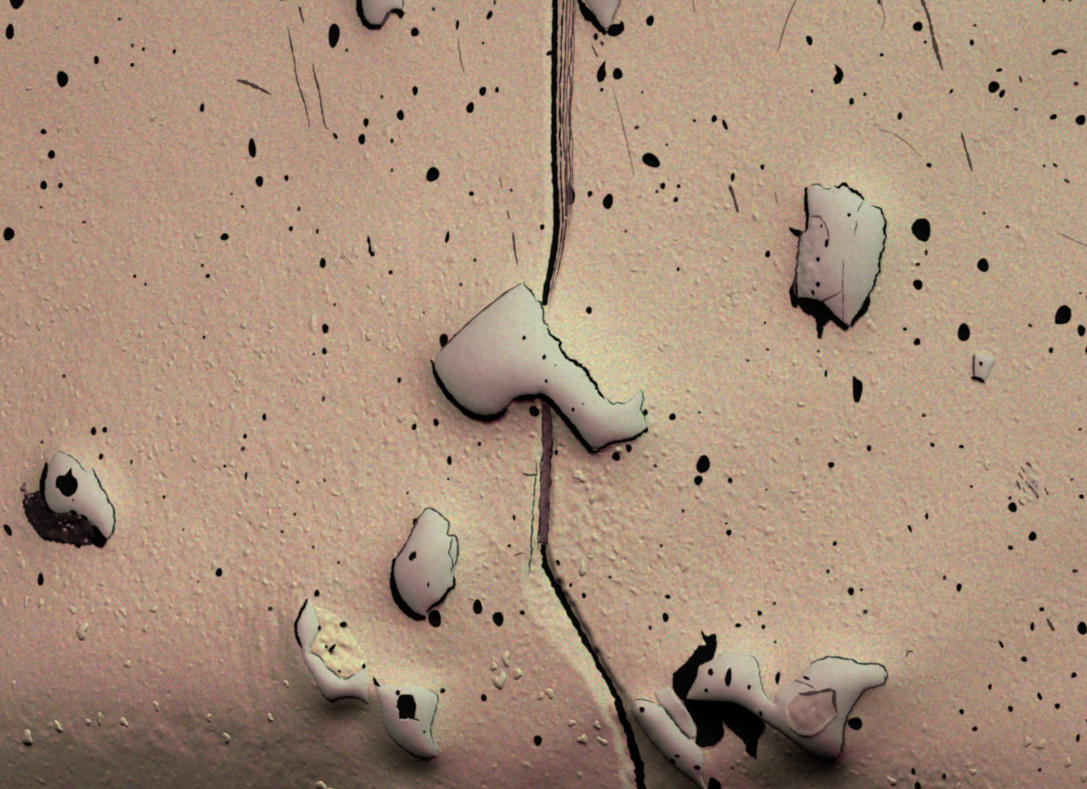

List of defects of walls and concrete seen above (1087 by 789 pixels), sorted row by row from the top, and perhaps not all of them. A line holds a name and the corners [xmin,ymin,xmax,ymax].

peeling [356,0,405,30]
peeling [577,0,625,46]
spalling [596,61,623,92]
crack [542,0,576,306]
peeling [789,182,887,353]
peeling [20,451,116,548]
peeling [389,507,459,628]
crack [523,403,646,789]
peeling [631,629,888,789]